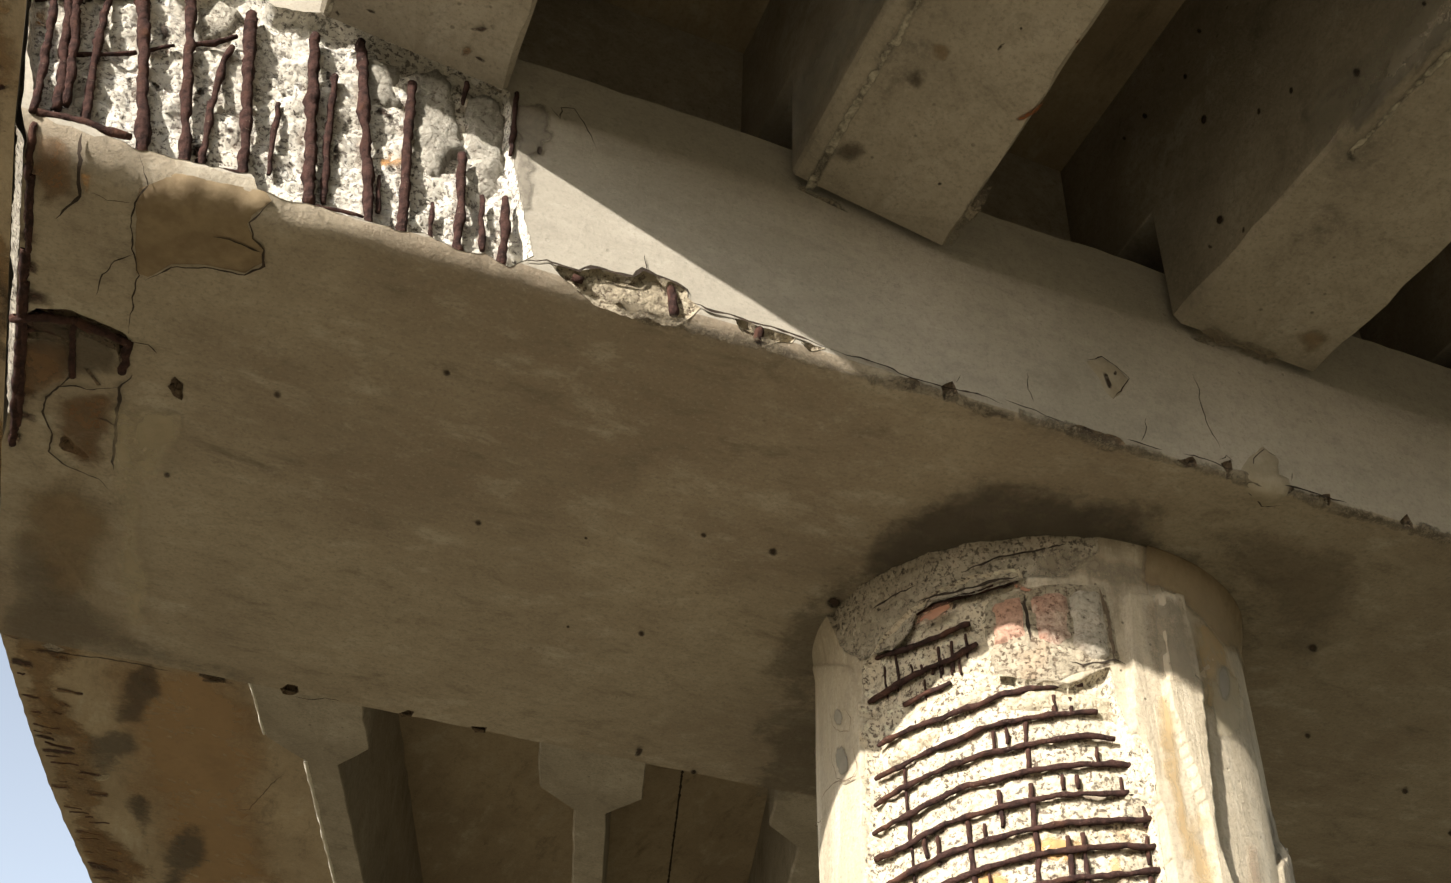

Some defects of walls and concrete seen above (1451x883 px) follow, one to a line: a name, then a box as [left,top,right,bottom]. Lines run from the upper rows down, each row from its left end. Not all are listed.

corrosion [0,121,69,465]
spalling [7,0,1262,487]
leakage [115,672,270,883]
leakage [303,760,337,883]
corrosion [918,604,950,622]
spalling [827,535,1166,883]
leakage [876,499,1145,572]
spalling [1287,485,1451,544]